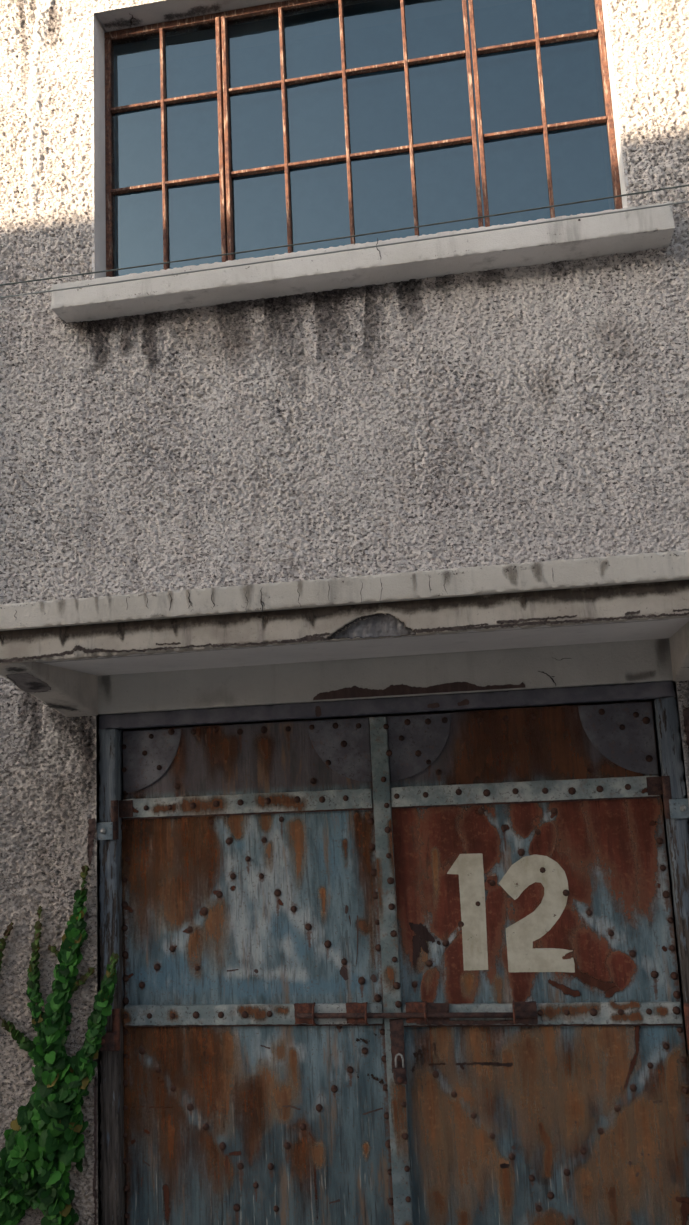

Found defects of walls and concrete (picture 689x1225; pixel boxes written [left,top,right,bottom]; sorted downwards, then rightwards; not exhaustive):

damp [18,0,56,51]
damp [62,308,187,368]
damp [216,279,420,365]
peeling [0,609,689,692]
peeling [313,682,525,700]
corrosion [255,793,307,879]
corrosion [122,791,245,972]
corrosion [339,705,662,1089]
corrosion [237,1005,289,1021]
corrosion [121,1010,340,1222]
corrosion [356,1072,409,1153]